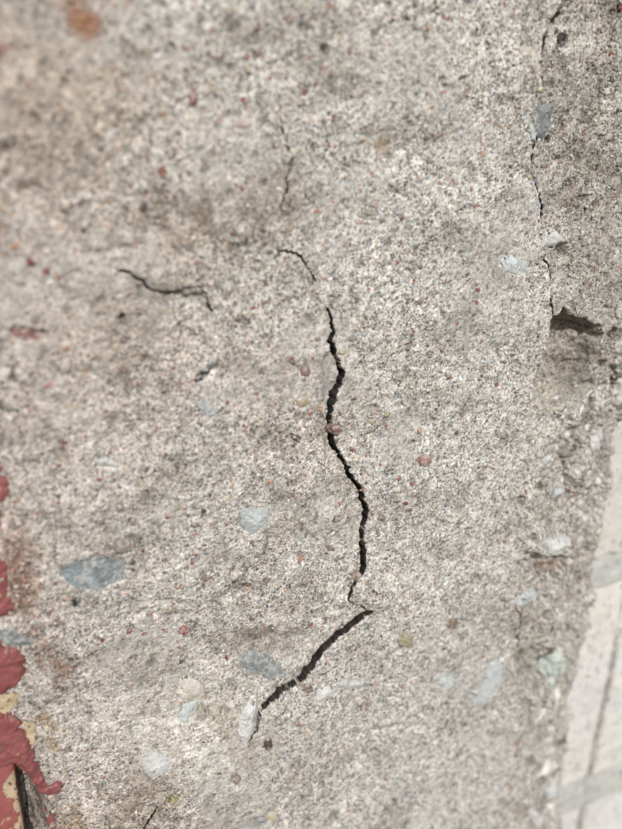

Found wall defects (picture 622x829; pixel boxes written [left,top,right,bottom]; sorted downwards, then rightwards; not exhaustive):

crack [539,0,566,79]
crack [530,137,543,232]
crack [115,269,213,312]
crack [278,250,316,281]
crack [542,259,553,315]
crack [248,308,374,743]
spalling [504,308,617,829]
peeling [0,692,20,715]
peeling [23,720,37,748]
peeling [2,771,24,829]
peeling [42,808,57,829]
crack [143,806,158,829]